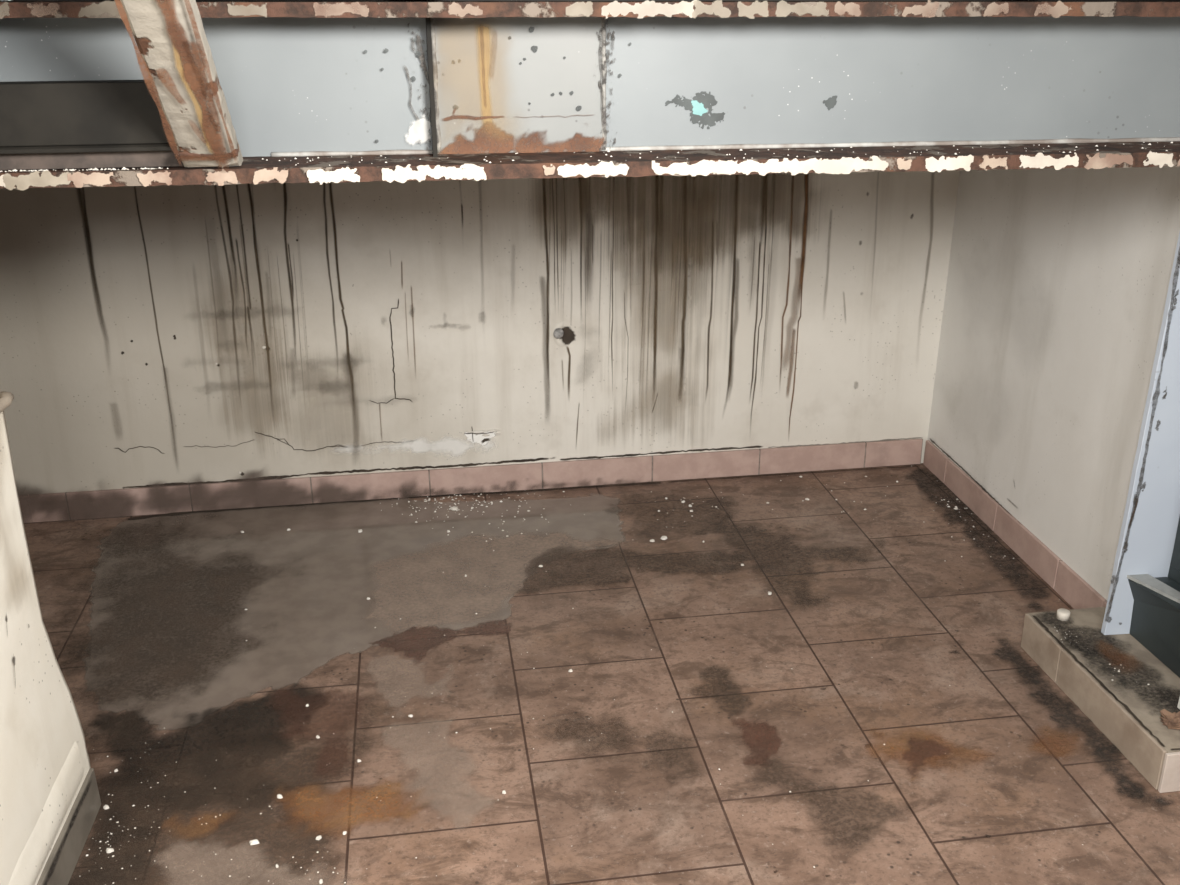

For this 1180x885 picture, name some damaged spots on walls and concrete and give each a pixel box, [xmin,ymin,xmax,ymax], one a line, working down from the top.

rust [115,0,237,165]
peeling [307,167,360,185]
peeling [382,164,487,183]
rust [440,26,604,154]
peeling [543,0,861,178]
peeling [652,151,1180,176]
damp [215,183,271,385]
damp [324,182,353,392]
crack [371,299,412,404]
damp [540,173,801,409]
crack [115,432,416,454]
damp [17,473,858,885]